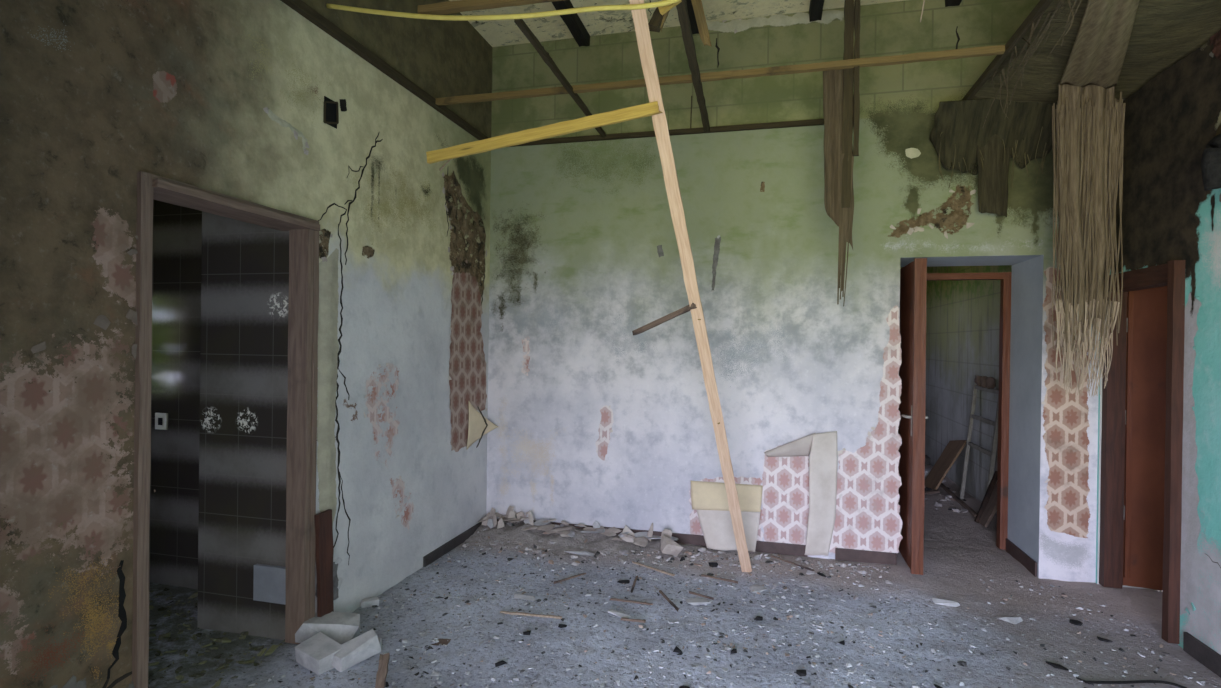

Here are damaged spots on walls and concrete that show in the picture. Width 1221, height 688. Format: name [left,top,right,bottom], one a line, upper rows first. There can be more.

flaking render [707,10,844,33]
flaking render [442,171,487,296]
damp [454,155,570,339]
flaking render [905,148,921,159]
flaking render [888,185,976,239]
crack [317,133,383,565]
peeling [467,402,499,449]
peeling [764,431,846,556]
crack [102,560,132,688]